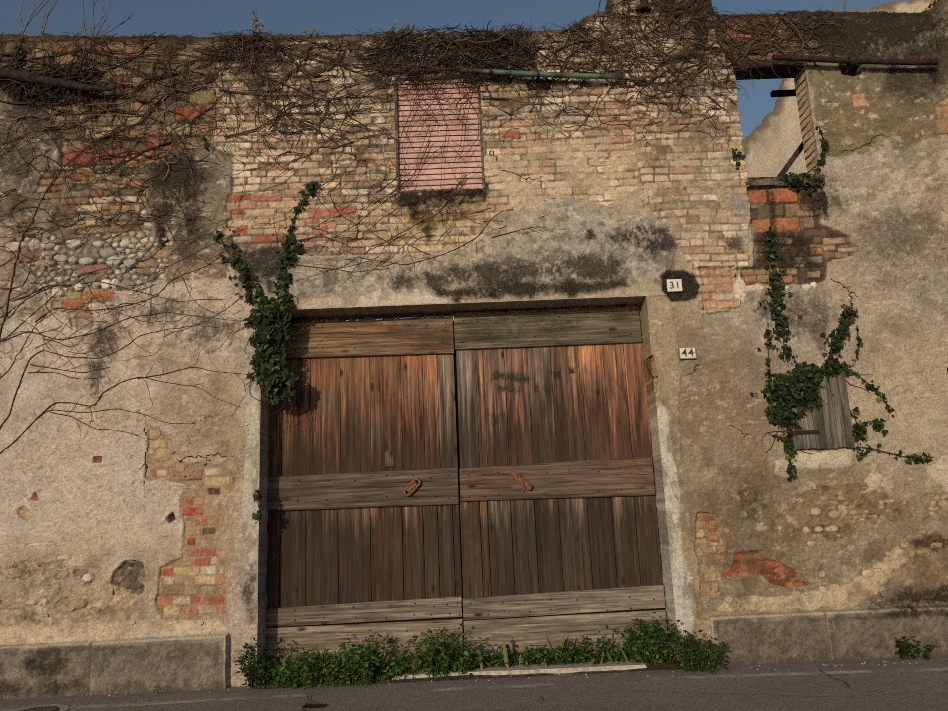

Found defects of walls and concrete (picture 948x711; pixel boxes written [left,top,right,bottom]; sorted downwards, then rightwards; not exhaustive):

flaking render [10,228,170,330]
damp [393,252,626,302]
damp [609,226,676,254]
flaking render [0,387,259,645]
flaking render [651,355,948,636]